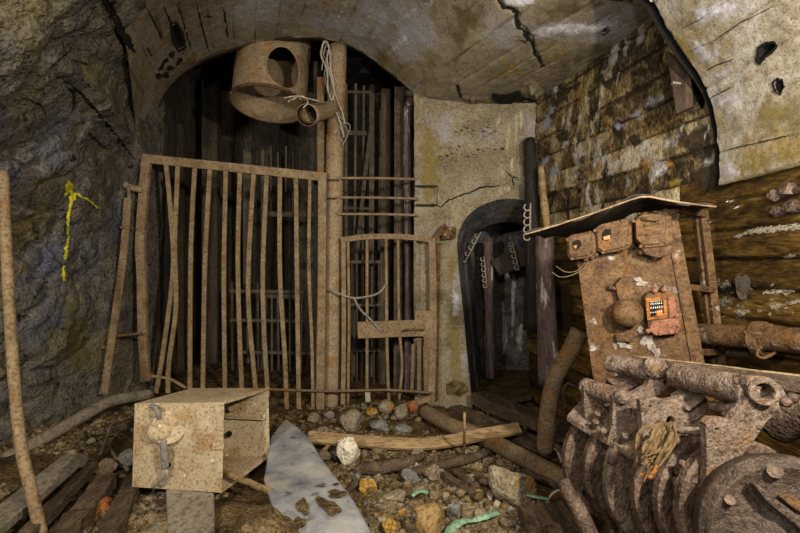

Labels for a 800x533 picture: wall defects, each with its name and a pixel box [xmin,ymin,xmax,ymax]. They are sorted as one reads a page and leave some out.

crack [494,0,545,68]
spalling [152,21,215,106]
hole [755,41,778,65]
spalling [462,79,545,104]
hole [772,78,785,96]
crack [432,171,525,207]